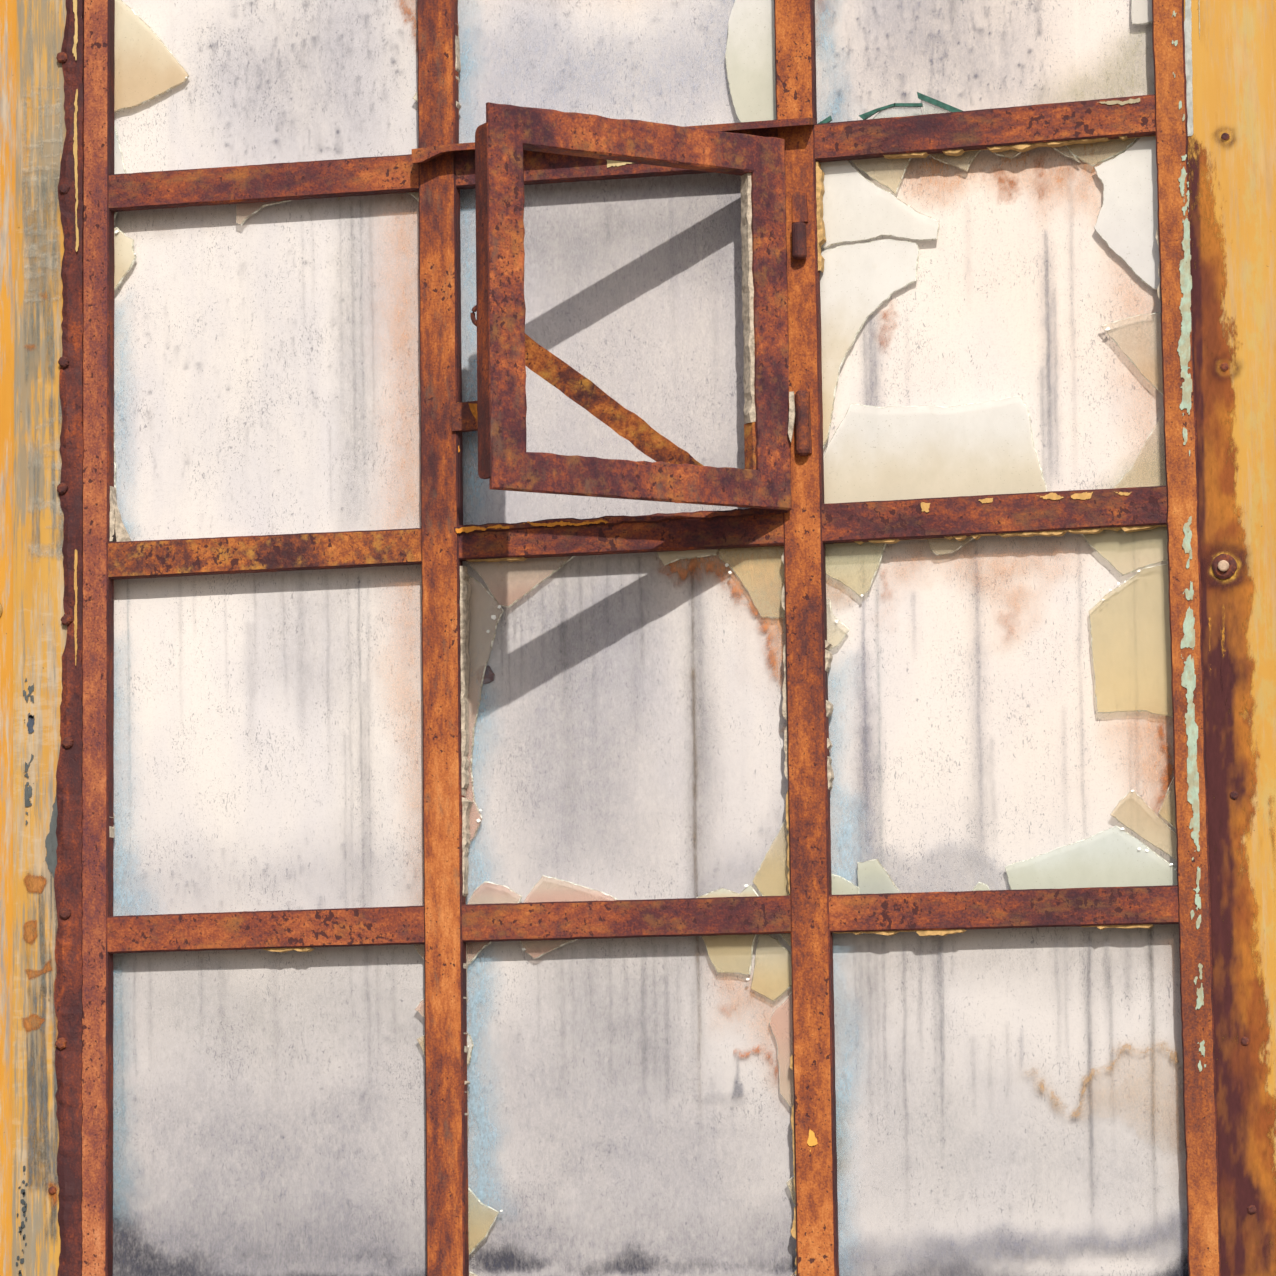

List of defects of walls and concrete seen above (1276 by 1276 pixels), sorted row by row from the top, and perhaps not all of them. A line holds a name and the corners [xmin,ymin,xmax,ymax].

peeling [1172,0,1200,136]
peeling [59,89,79,252]
peeling [1177,155,1192,456]
rust [744,422,756,470]
rust [666,554,785,679]
peeling [1181,516,1201,929]
rust [1188,136,1276,1276]
rust [24,920,37,944]
rust [24,875,46,893]
peeling [16,797,58,1276]
damp [113,1207,247,1276]
damp [1166,1258,1189,1276]